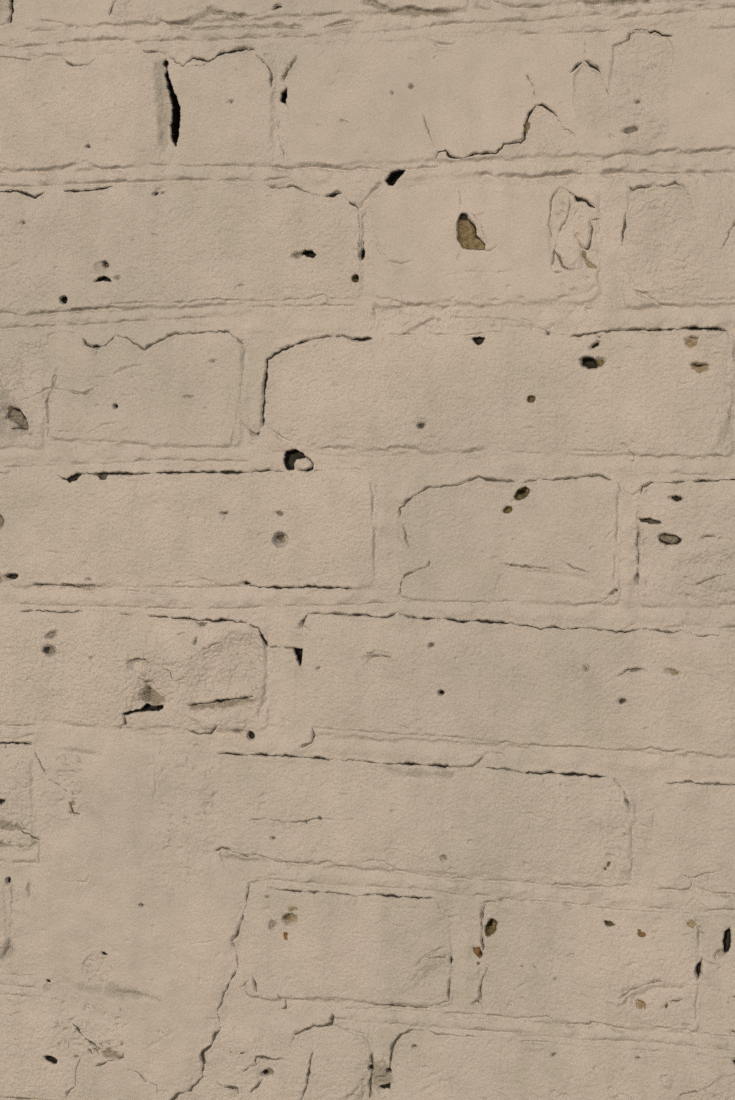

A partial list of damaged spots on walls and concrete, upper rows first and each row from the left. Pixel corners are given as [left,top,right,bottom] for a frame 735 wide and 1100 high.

crack [144,48,297,87]
crack [271,186,358,208]
peeling [456,213,496,251]
peeling [548,187,601,274]
crack [262,340,308,425]
spalling [284,449,305,470]
crack [399,483,463,541]
crack [501,563,592,574]
spalling [723,928,731,953]
crack [64,887,349,1100]
crack [369,1004,440,1098]